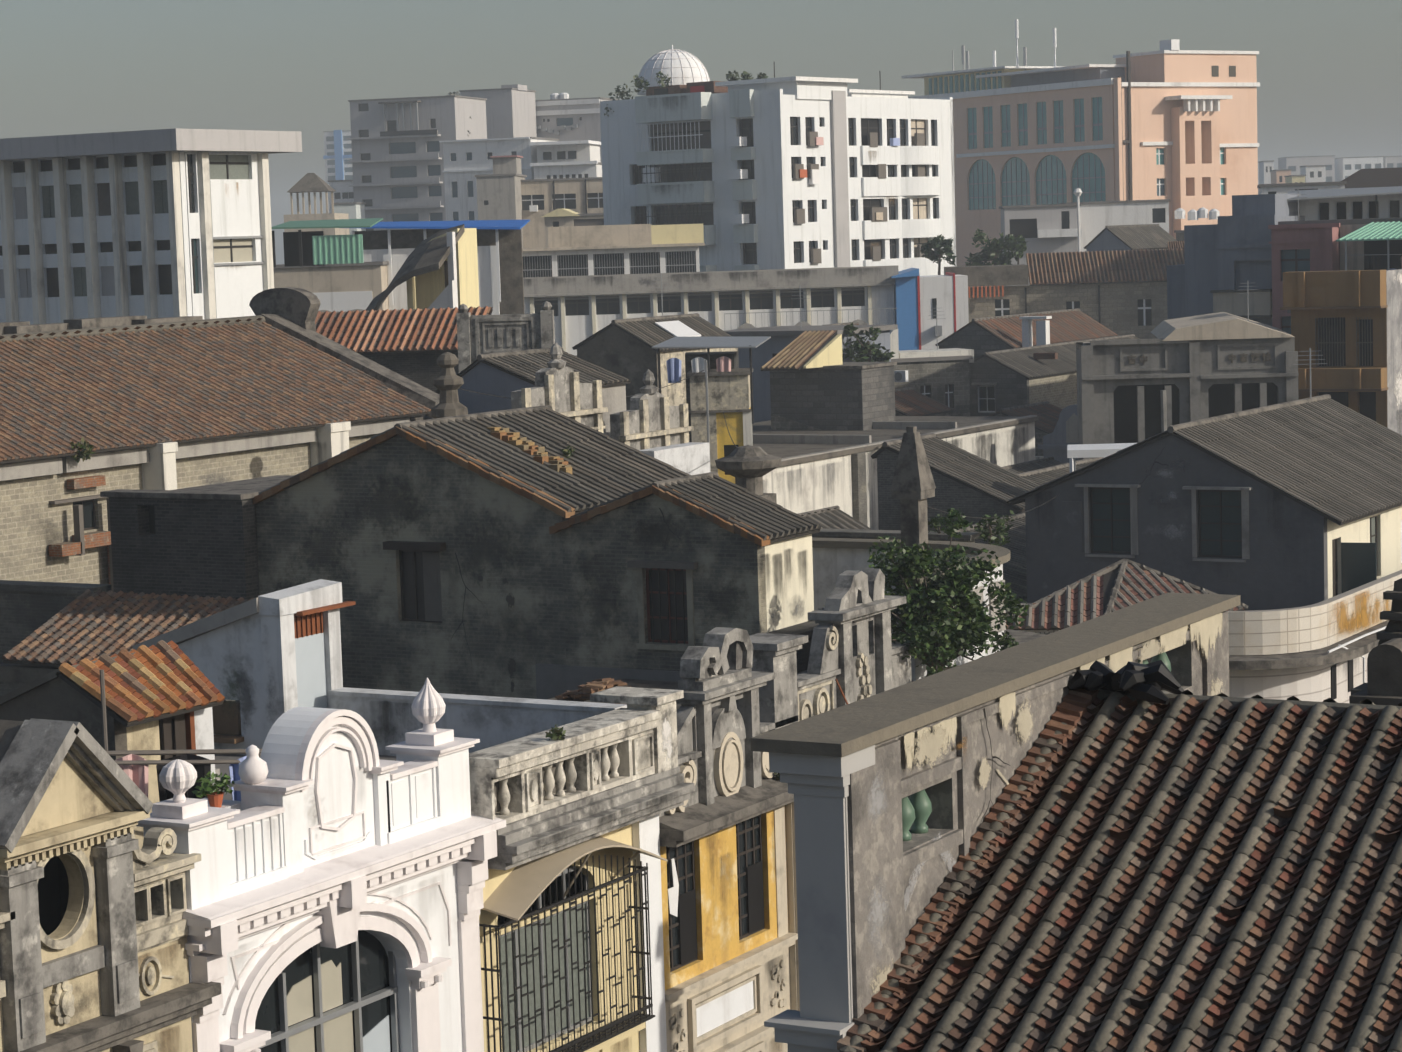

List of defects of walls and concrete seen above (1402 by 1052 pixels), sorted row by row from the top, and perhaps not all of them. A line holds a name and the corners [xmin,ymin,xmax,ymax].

rust [1339,592,1390,631]
peeling [904,717,957,769]
peeling [999,692,1034,743]
peeling [979,757,991,790]